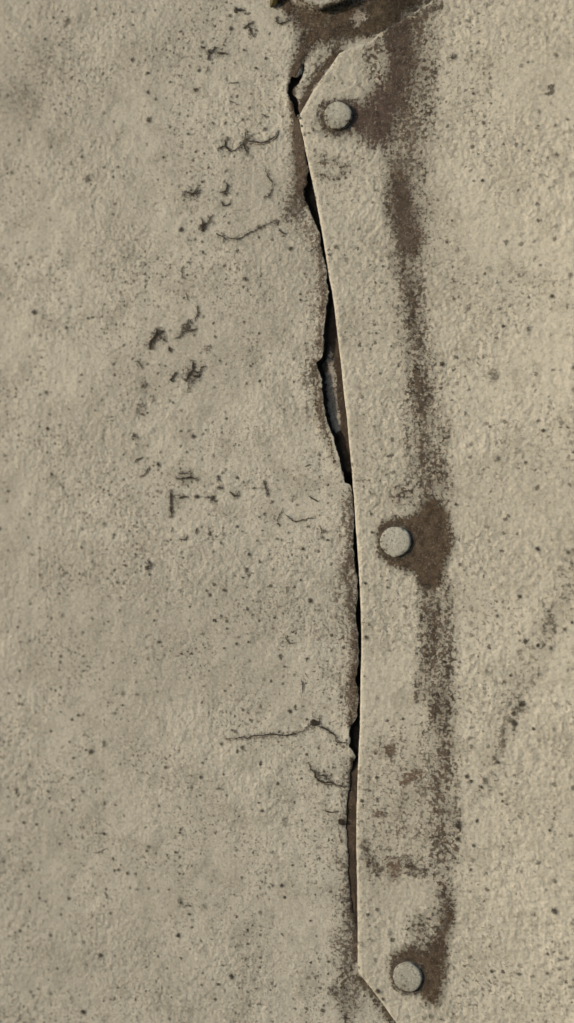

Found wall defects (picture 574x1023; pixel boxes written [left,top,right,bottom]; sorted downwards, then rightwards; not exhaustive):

crack [181,114,285,242]
crack [165,470,240,542]
crack [263,481,326,534]
corrosion [317,0,461,1006]
crack [225,714,348,746]
crack [307,762,345,814]
crack [352,839,360,936]